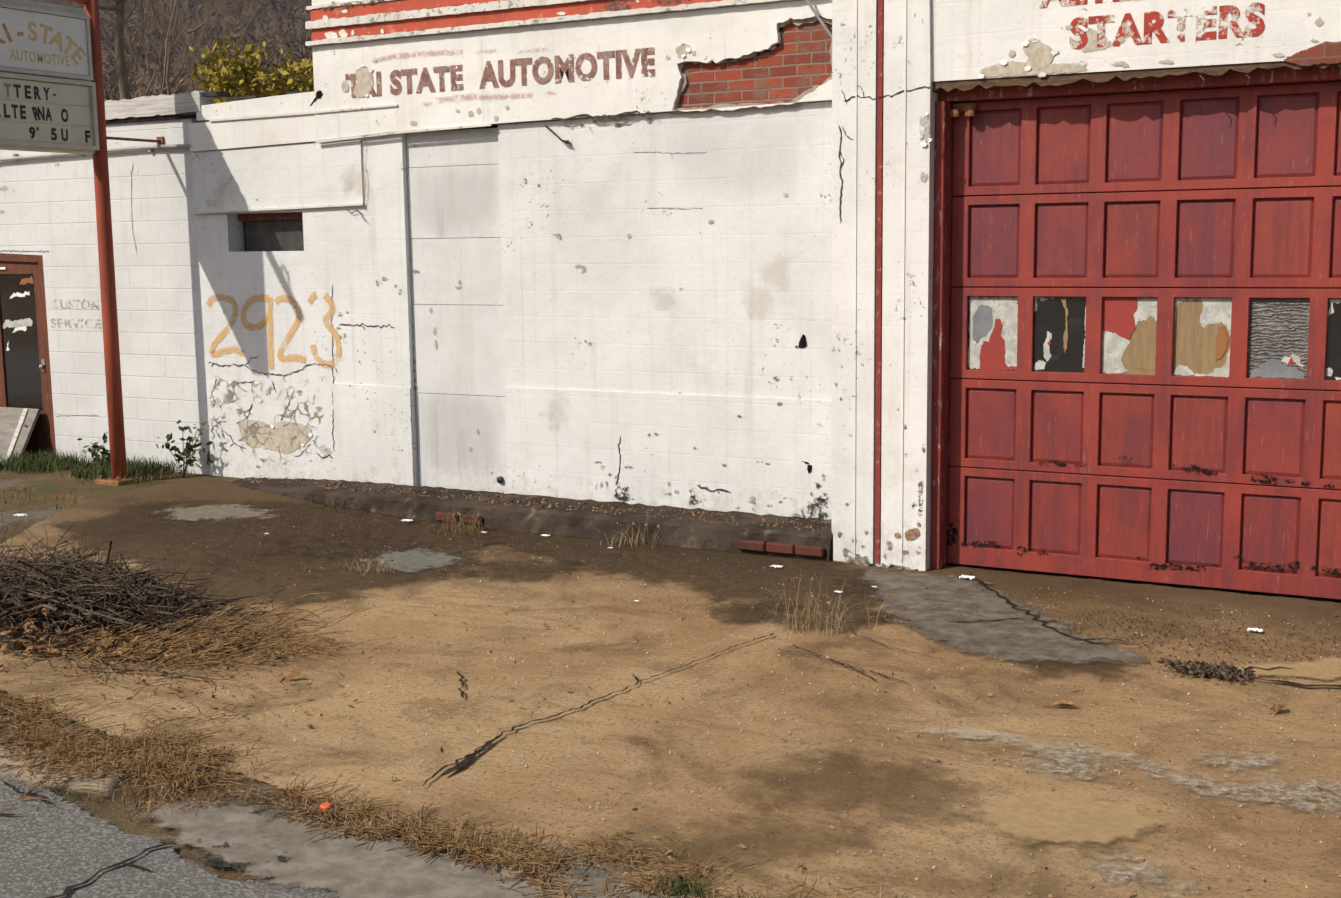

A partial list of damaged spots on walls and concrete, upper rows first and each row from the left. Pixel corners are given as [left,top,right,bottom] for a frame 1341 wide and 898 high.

peeling [342,50,461,98]
flaking render [647,20,832,114]
peeling [978,25,1125,79]
crack [838,86,931,223]
peeling [968,296,1018,371]
peeling [1034,297,1086,370]
peeling [1102,297,1157,374]
peeling [1173,298,1232,377]
peeling [1249,354,1305,379]
peeling [207,379,332,468]
crack [614,437,622,492]